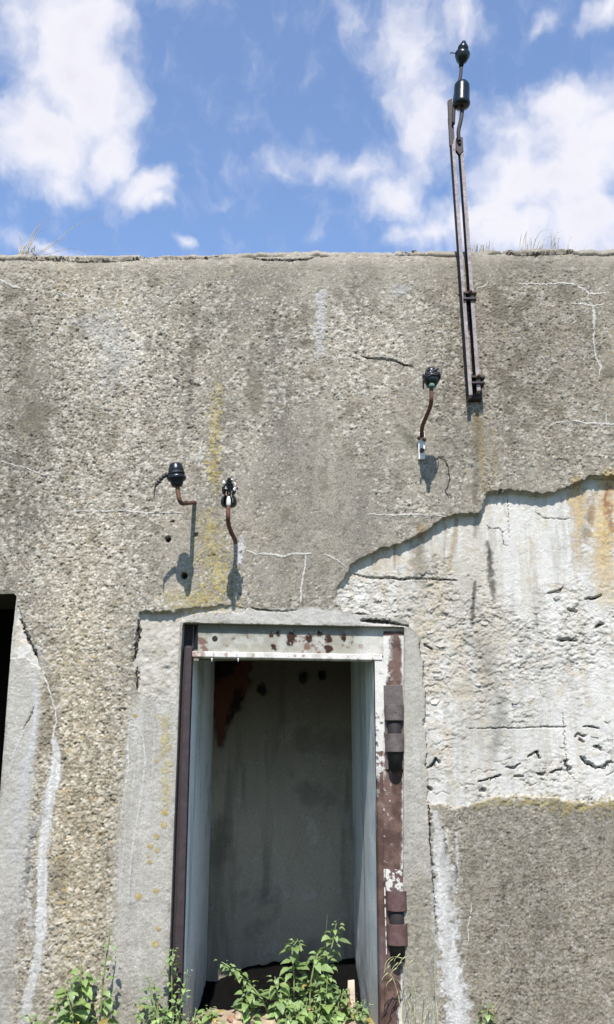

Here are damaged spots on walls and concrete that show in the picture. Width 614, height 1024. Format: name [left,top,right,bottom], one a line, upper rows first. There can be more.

crack [519,282,605,376]
rust [567,470,614,576]
crack [246,550,458,612]
crack [21,621,57,740]
crack [133,622,141,690]
rust [214,661,252,747]
spalling [334,475,614,954]
crack [469,713,567,764]
water stain [21,737,61,1024]
water stain [432,811,474,1024]